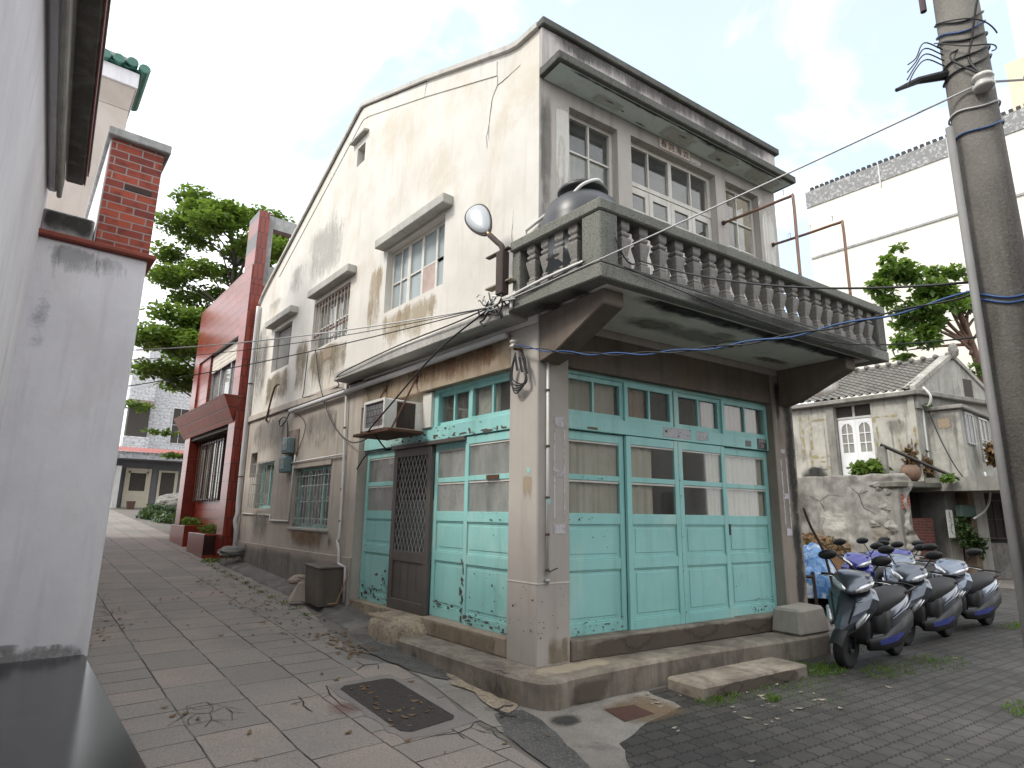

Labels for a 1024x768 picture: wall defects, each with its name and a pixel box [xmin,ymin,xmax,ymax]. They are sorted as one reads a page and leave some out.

crack [486,65,520,141]
water stain [368,268,382,317]
water stain [384,296,434,339]
water stain [256,327,346,400]
crack [816,489,874,534]
peeling [433,559,558,639]
crack [170,702,250,725]